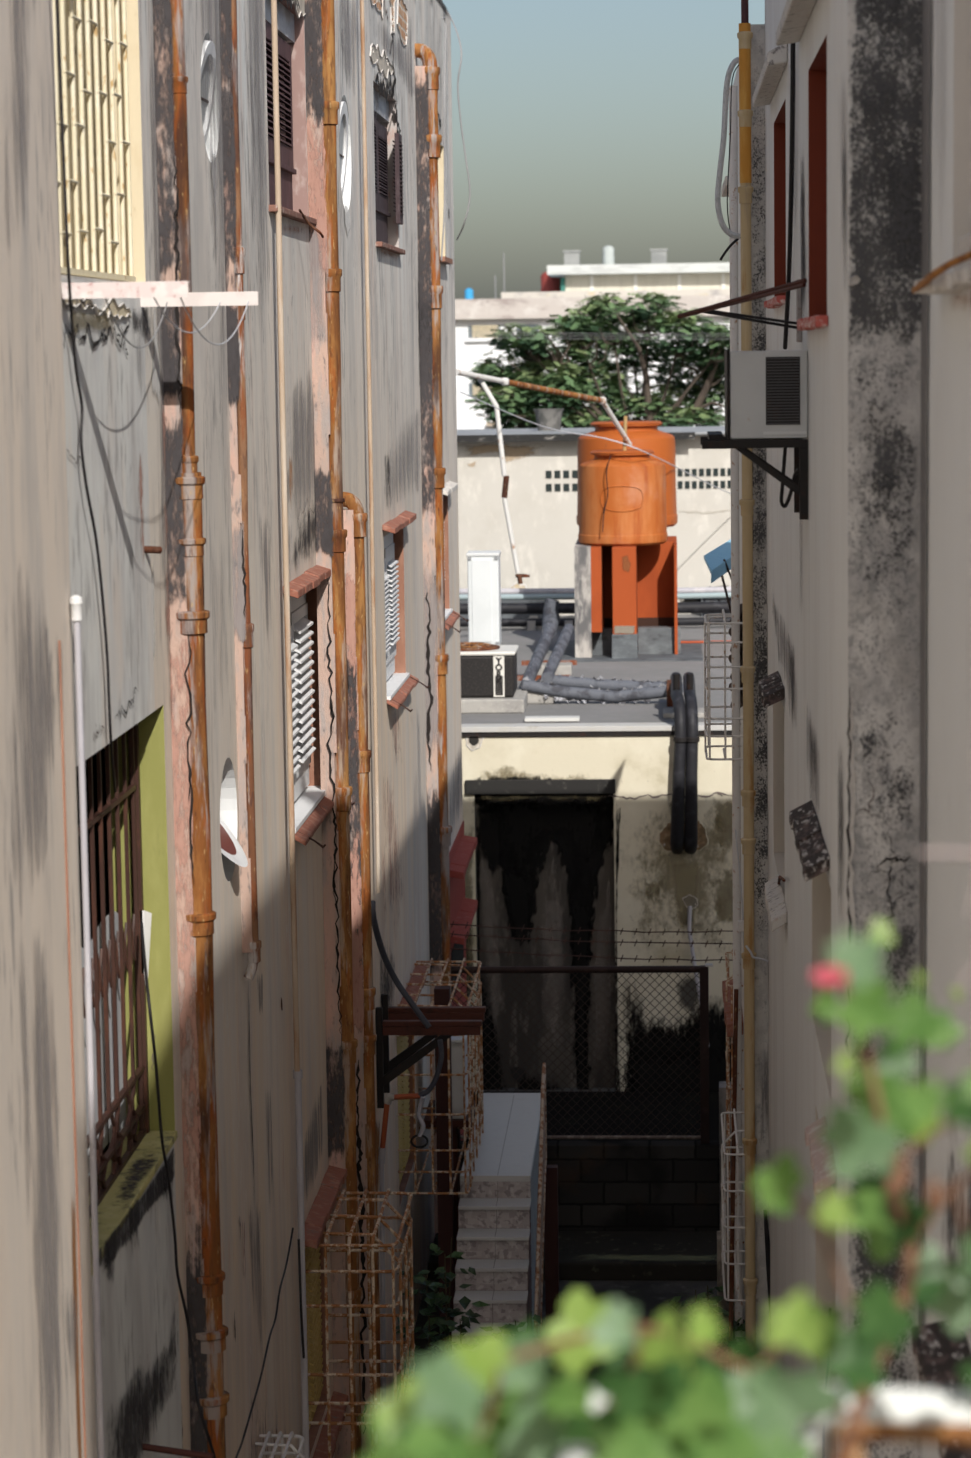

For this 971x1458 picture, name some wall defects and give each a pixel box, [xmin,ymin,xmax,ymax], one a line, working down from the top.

damp [150,0,177,281]
damp [202,0,238,287]
damp [226,306,240,405]
damp [222,526,270,642]
damp [289,374,334,565]
damp [304,0,328,321]
flaking render [370,0,408,79]
damp [384,29,435,512]
damp [423,575,438,748]
damp [99,306,208,1458]
damp [427,761,733,1092]
damp [305,1046,345,1192]